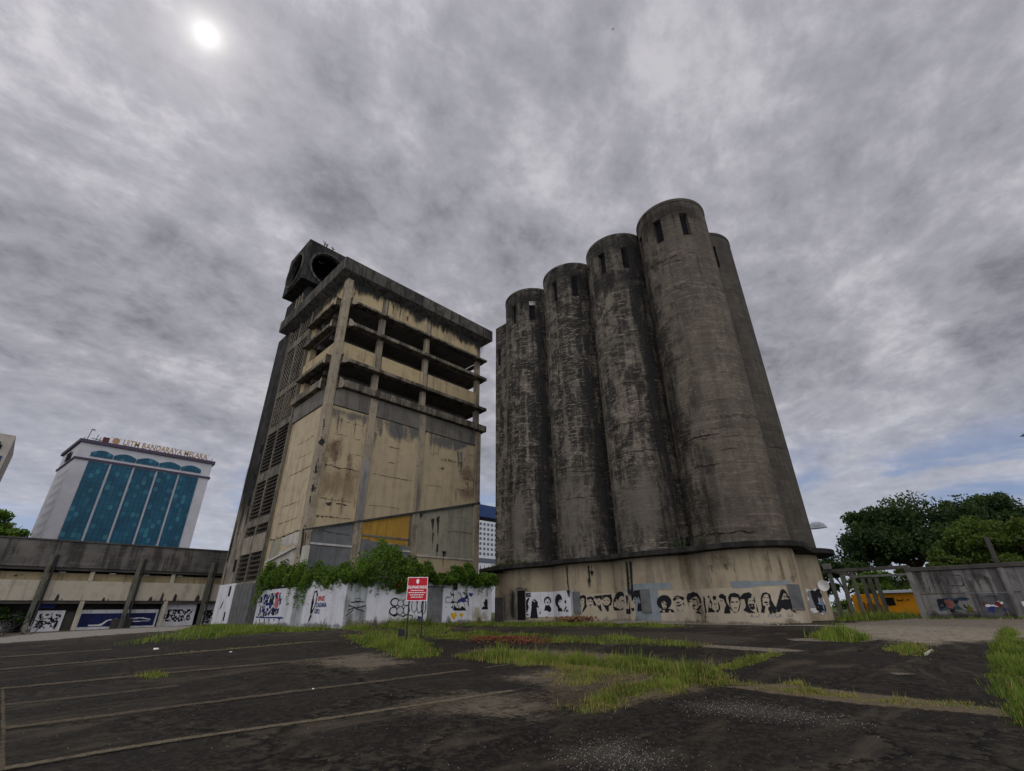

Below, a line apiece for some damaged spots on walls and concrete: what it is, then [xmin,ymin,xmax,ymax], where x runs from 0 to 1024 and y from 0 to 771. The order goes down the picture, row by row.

leakage [294,283,482,349]
leakage [334,409,467,469]
leakage [510,244,689,596]